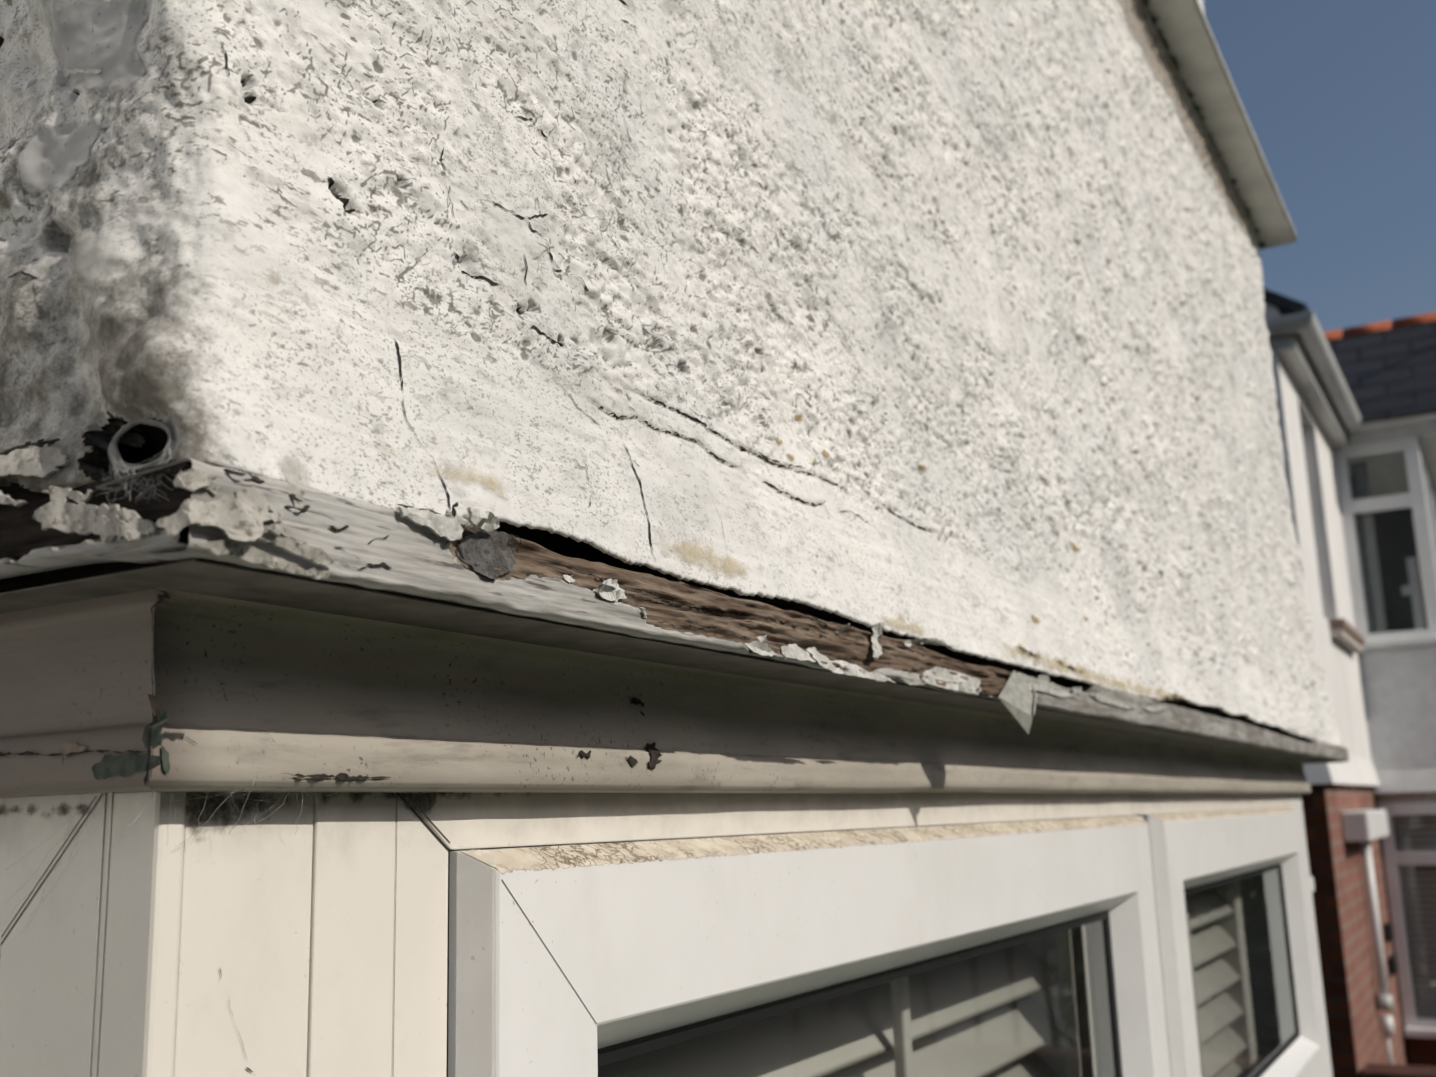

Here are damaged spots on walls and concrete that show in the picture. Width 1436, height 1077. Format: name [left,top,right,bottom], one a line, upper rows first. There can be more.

crack [441,148,589,296]
peeling [0,446,336,580]
peeling [397,507,500,541]
crack [517,325,975,668]
peeling [593,578,647,618]
peeling [91,693,170,780]
peeling [744,622,982,695]
peeling [998,670,1170,734]